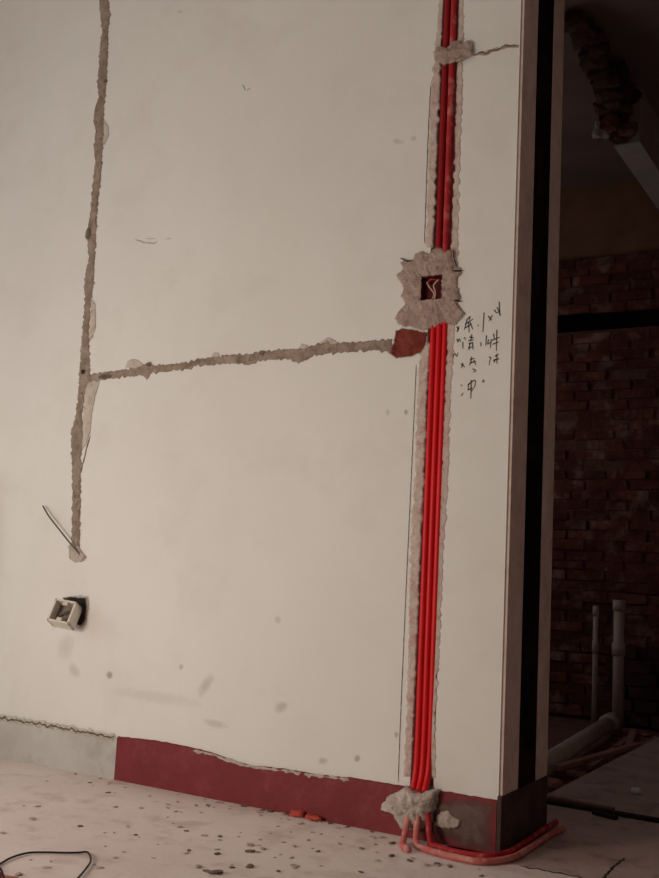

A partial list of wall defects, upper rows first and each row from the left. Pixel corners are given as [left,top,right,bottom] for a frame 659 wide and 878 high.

crack [476,45,518,55]